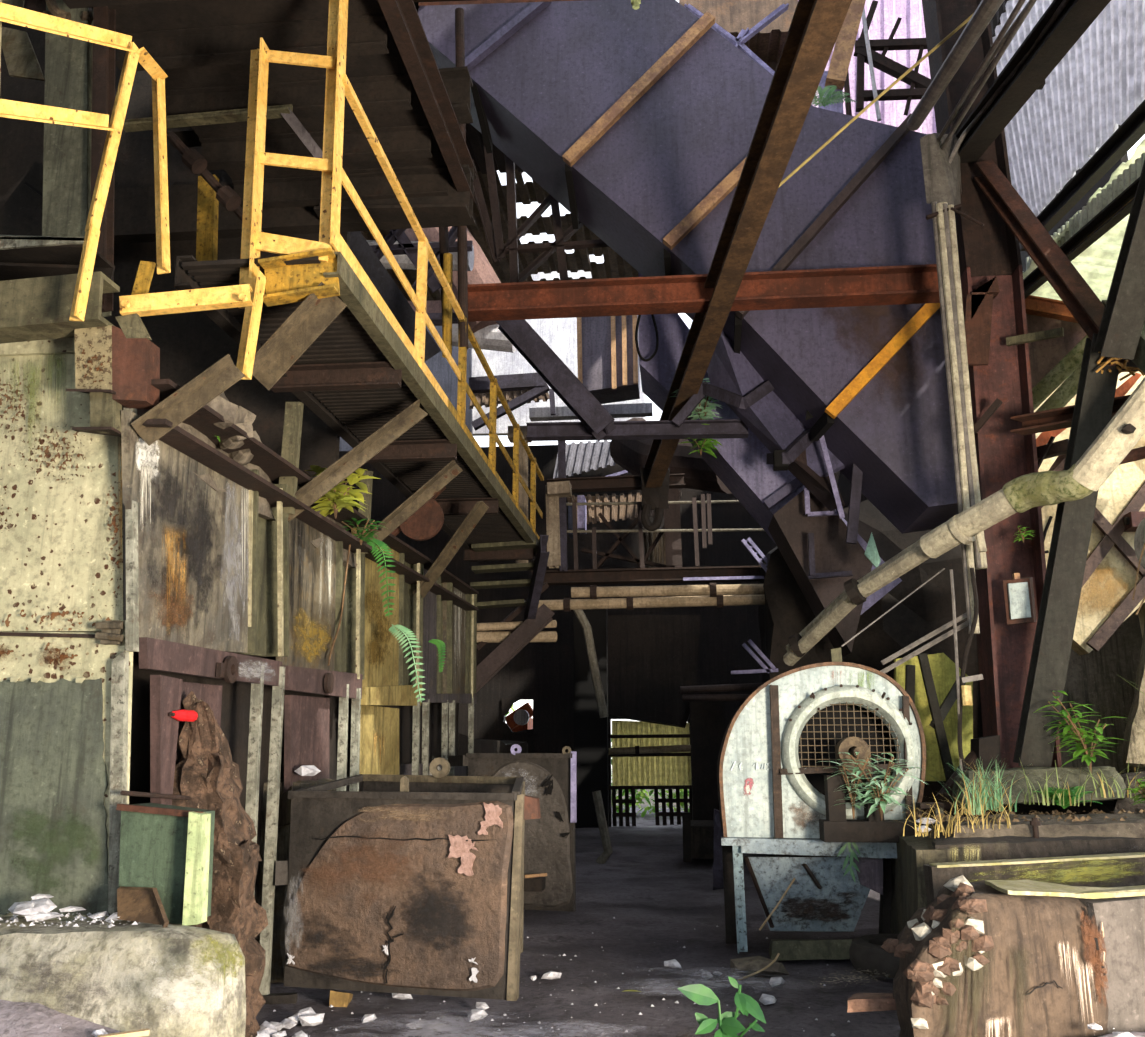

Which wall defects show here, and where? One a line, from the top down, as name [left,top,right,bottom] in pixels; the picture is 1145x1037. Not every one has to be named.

rust [0,368,95,484]
rust [2,606,110,631]
rust [40,642,78,669]
rust [106,437,123,605]
leakage [136,438,160,522]
rust [160,531,189,625]
leakage [189,485,249,636]